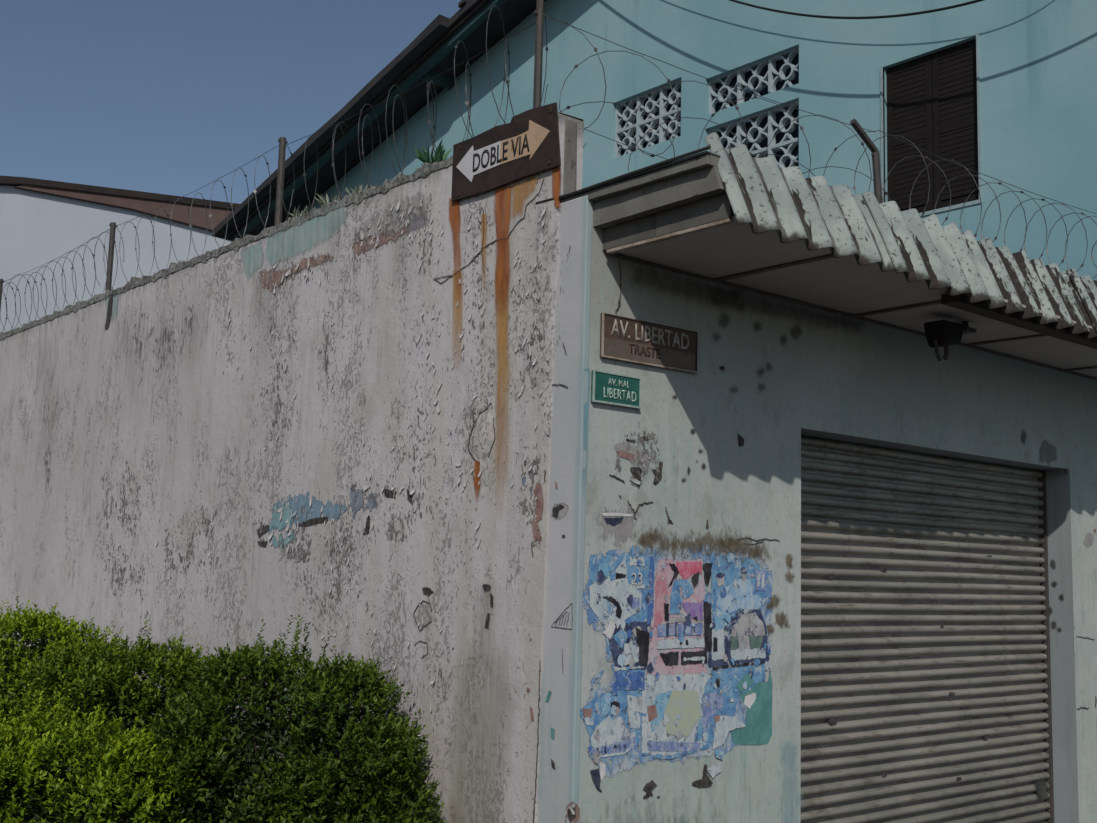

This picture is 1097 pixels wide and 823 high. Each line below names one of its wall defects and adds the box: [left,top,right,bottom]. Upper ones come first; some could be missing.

corrosion [552,166,561,207]
corrosion [449,199,462,328]
corrosion [481,177,535,430]
peeling [509,204,564,437]
peeling [216,297,300,463]
peeling [242,193,505,736]
spalling [511,443,568,556]
peeling [614,421,665,487]
peeling [731,672,772,745]
spalling [590,762,605,792]
spalling [692,764,713,788]